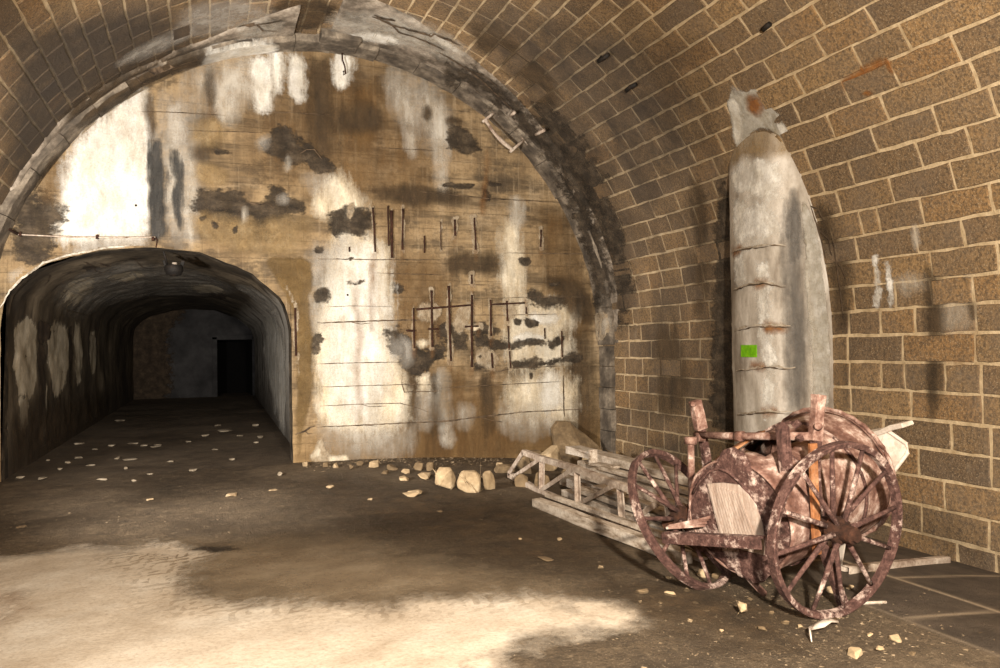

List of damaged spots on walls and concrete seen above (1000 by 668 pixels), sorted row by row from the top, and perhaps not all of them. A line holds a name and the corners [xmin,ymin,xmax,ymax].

leakage [0,29,593,459]
rust [371,205,406,258]
rust [440,214,479,254]
crack [732,244,786,255]
crack [733,280,784,291]
leakage [872,255,893,306]
spalling [419,303,442,322]
spalling [453,302,479,335]
crack [736,323,790,331]
spalling [476,347,499,369]
crack [736,364,795,372]